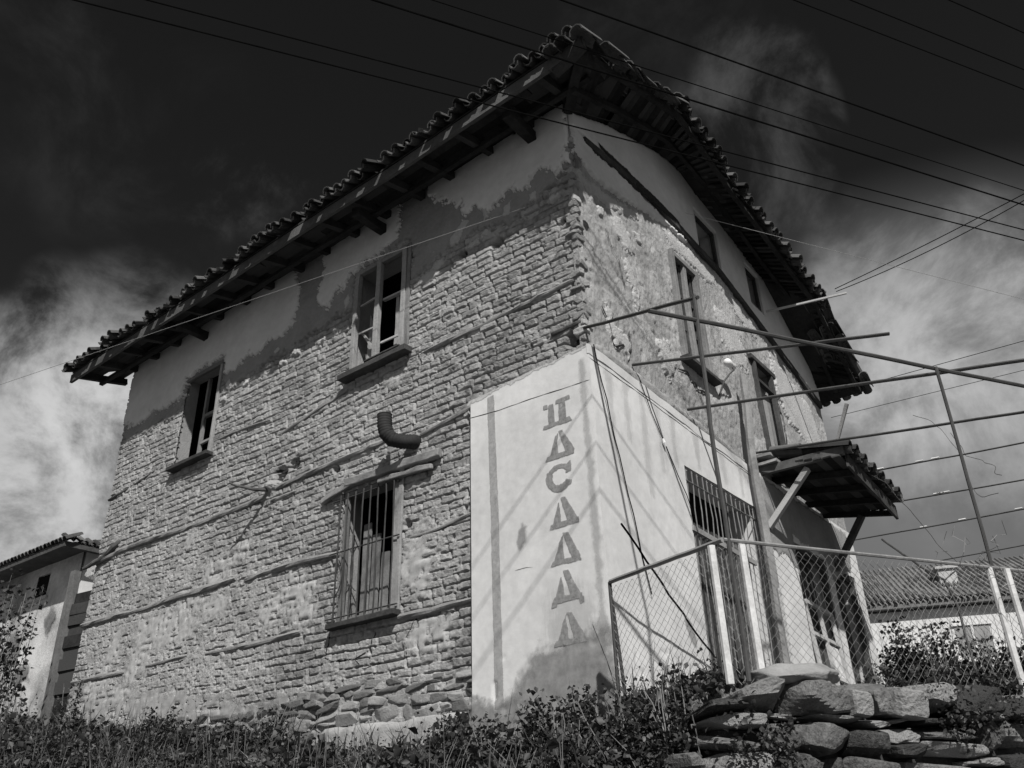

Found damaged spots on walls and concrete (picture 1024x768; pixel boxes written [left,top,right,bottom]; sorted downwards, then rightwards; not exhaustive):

flaking render [316,204,403,312]
flaking render [415,104,757,375]
flaking render [123,271,303,430]
flaking render [655,338,677,384]
flaking render [767,352,820,444]